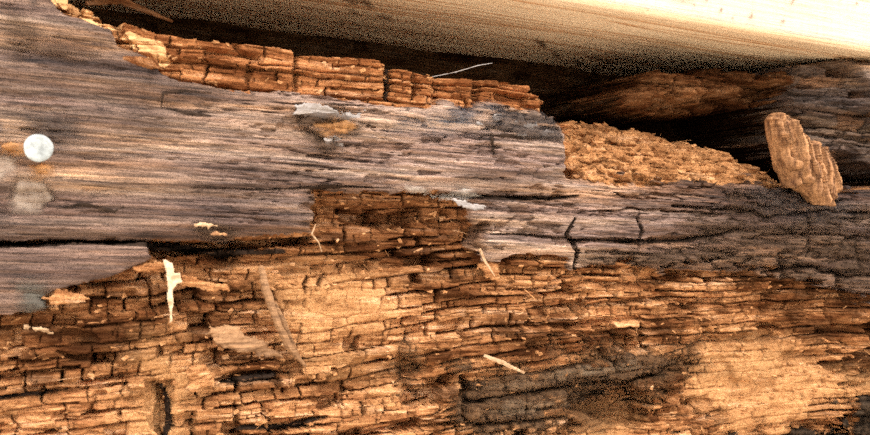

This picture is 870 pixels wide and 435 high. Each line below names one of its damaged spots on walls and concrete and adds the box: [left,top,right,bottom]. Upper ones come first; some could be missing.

spalling [68,0,792,191]
spalling [838,165,870,186]
crack [436,193,578,201]
crack [0,240,285,258]
peeling [194,222,238,243]
spalling [315,188,489,271]
crack [511,208,731,270]